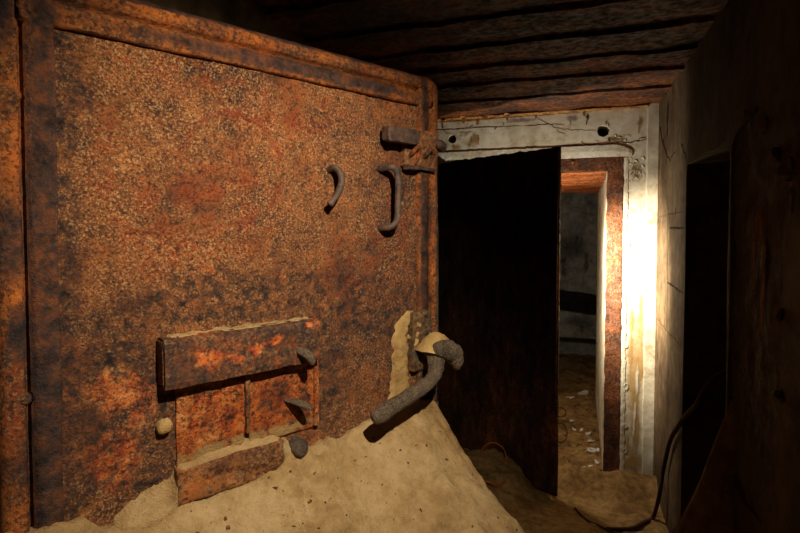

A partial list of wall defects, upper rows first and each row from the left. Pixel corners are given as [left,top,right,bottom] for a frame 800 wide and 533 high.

crack [438,125,510,134]
crack [529,117,587,133]